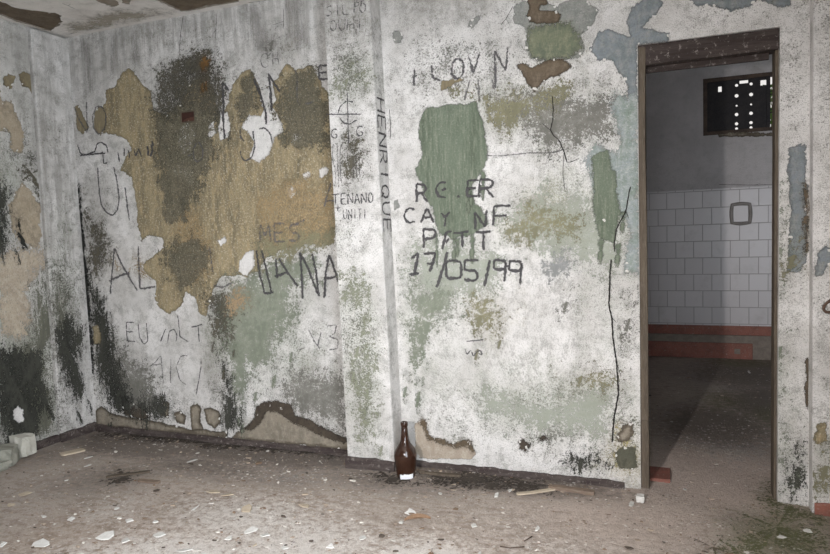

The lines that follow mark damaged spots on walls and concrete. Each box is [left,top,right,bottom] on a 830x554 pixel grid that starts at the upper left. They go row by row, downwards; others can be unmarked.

spalling [0,2,62,30]
spalling [157,0,238,10]
peeling [690,0,791,12]
water stain [0,169,28,265]
water stain [16,152,40,203]
peeling [75,64,335,317]
crack [542,96,579,189]
peeling [513,0,670,276]
peeling [779,144,830,280]
water stain [0,184,361,460]
crack [608,187,631,442]
spalling [96,393,347,450]